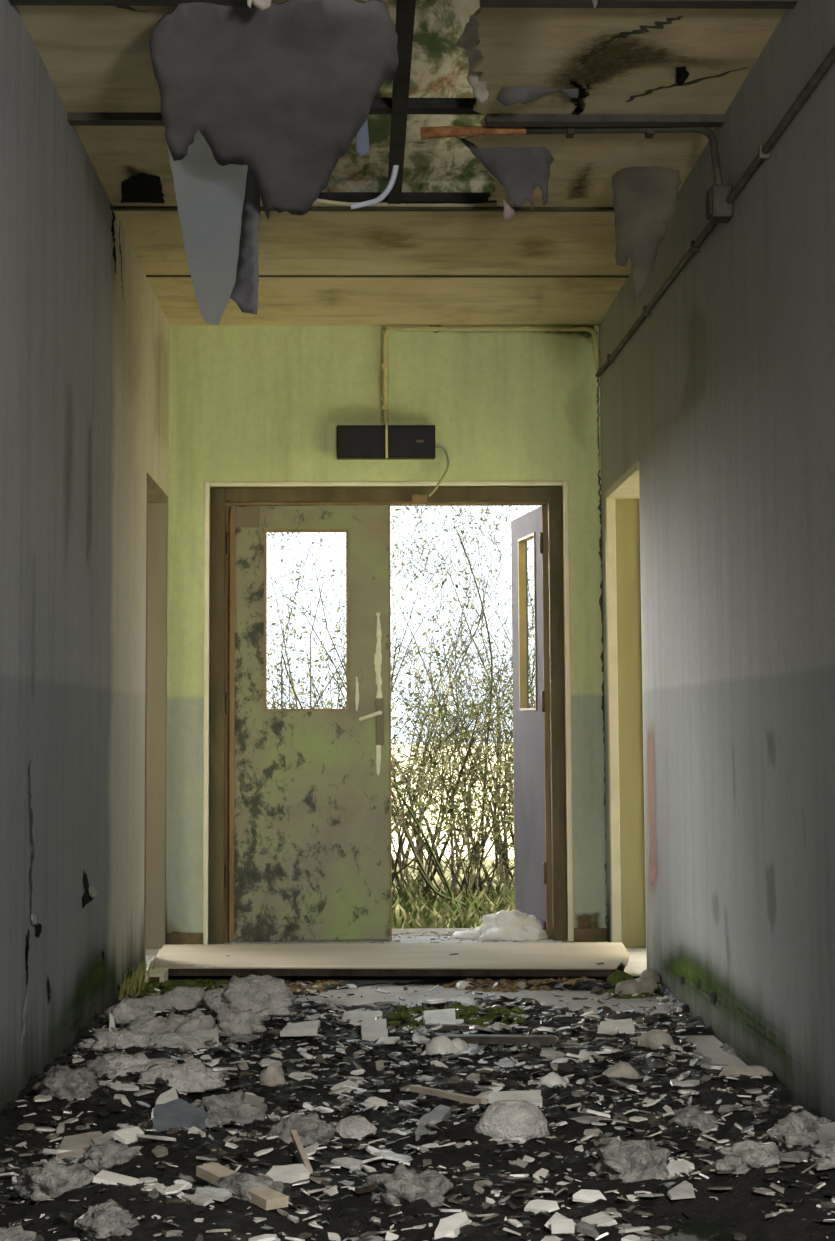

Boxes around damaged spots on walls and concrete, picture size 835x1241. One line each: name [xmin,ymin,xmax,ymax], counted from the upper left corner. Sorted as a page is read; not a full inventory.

crack [570,16,683,115]
crack [625,68,745,102]
spalling [121,166,165,203]
crack [20,761,35,1046]
flaking render [82,870,98,908]